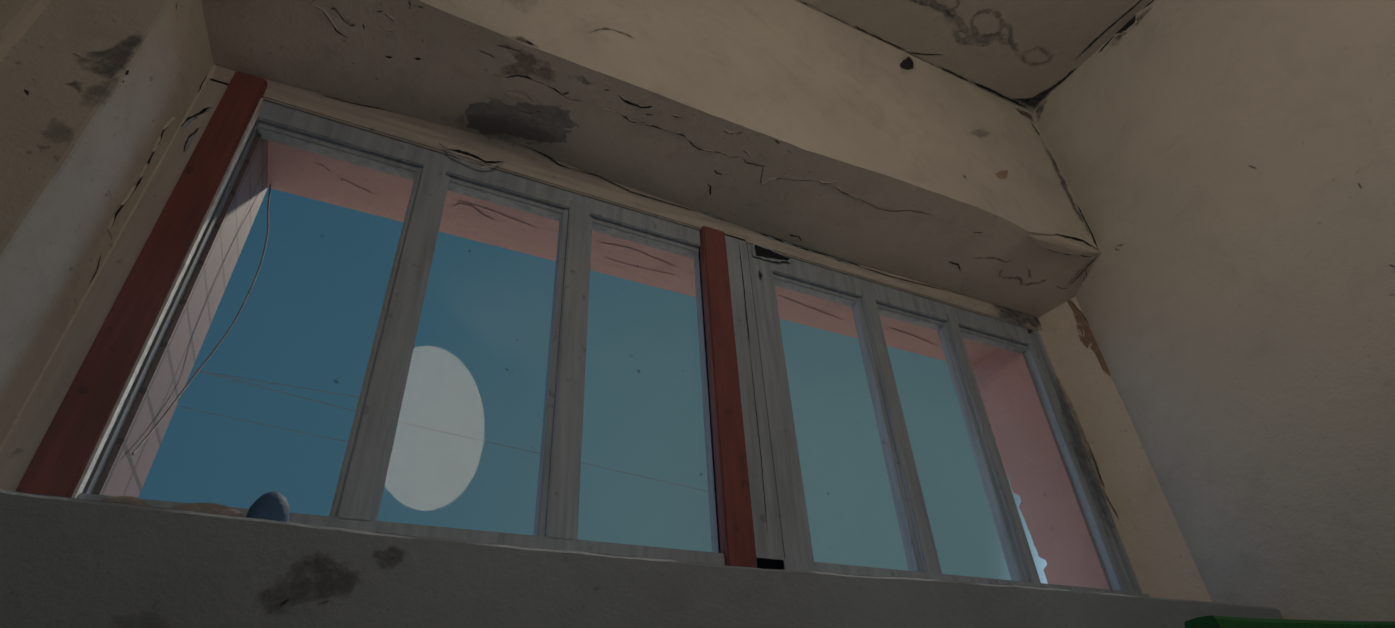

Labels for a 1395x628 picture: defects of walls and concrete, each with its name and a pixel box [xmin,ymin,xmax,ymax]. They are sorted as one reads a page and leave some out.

damp [913,0,1052,66]
crack [90,76,213,283]
crack [316,93,381,109]
crack [452,200,536,228]
spalling [460,53,581,146]
crack [797,0,1154,249]
crack [478,45,943,542]
spalling [1057,257,1111,378]